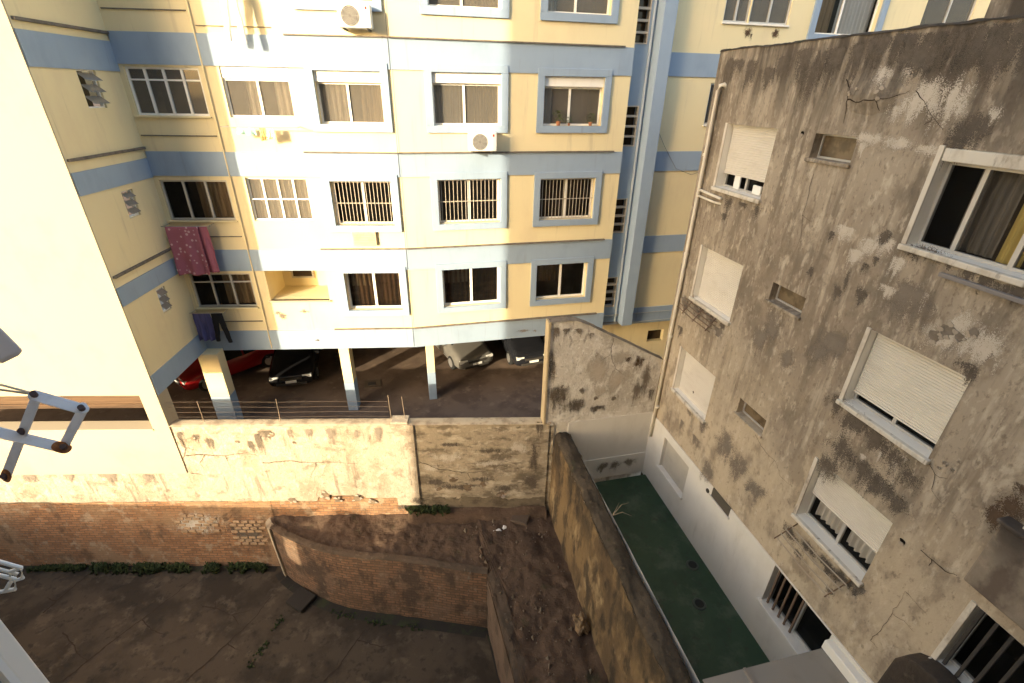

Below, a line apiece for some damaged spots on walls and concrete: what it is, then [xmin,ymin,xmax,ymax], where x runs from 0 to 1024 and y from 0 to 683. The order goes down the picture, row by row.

water stain [722,20,1024,170]
crack [843,79,942,128]
water stain [826,224,1024,386]
water stain [175,431,216,452]
water stain [247,430,271,456]
water stain [397,327,654,510]
water stain [679,409,768,507]
water stain [817,392,926,520]
spalling [167,511,269,546]